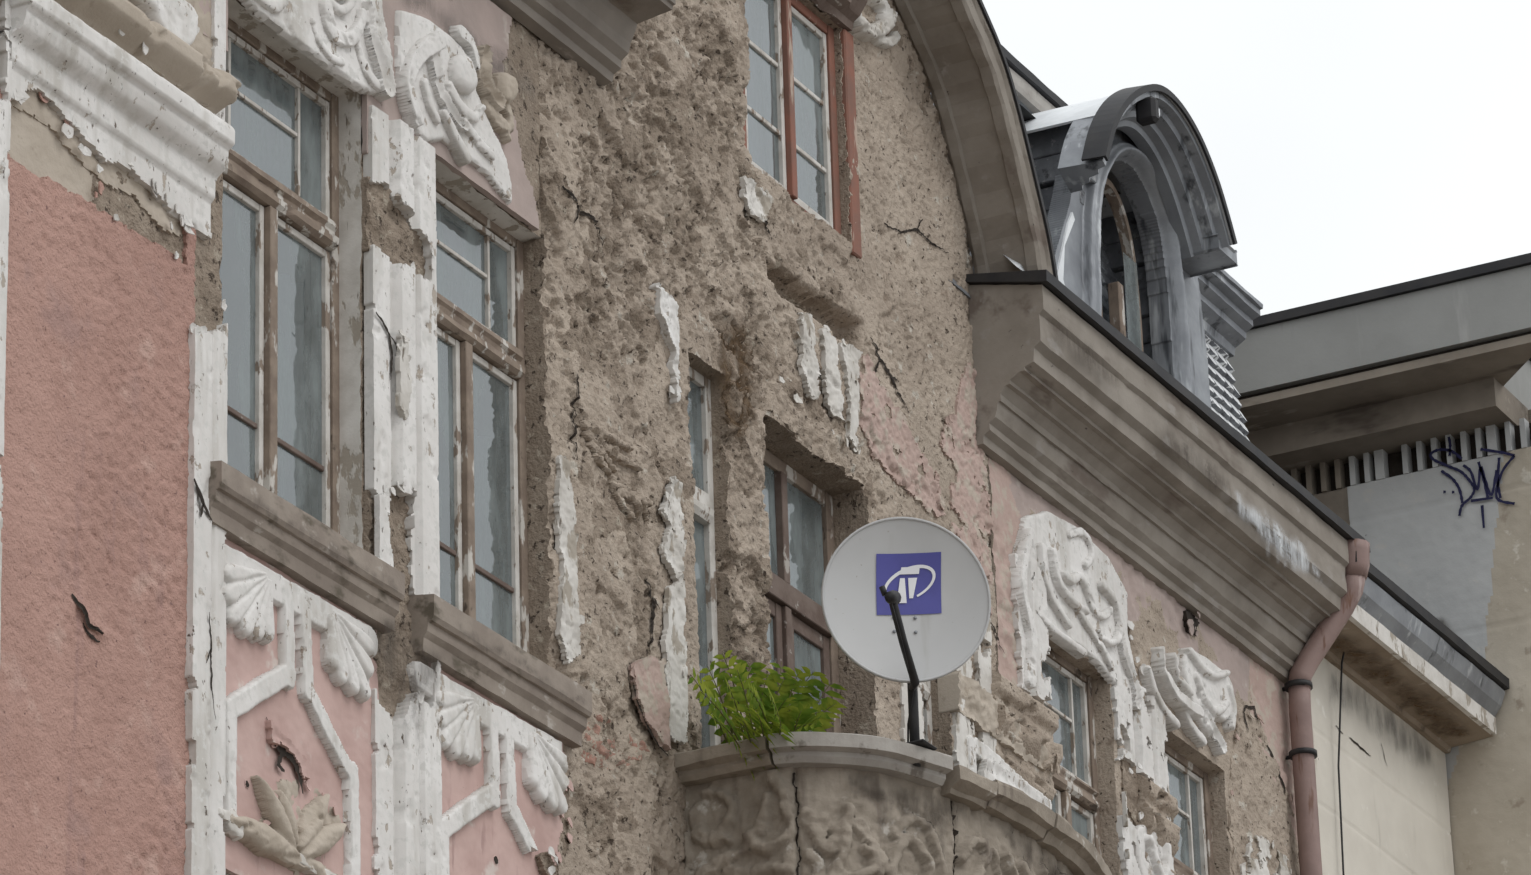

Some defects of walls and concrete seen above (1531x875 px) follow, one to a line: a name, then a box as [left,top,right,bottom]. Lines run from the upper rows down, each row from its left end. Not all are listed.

flaking render [142,42,215,114]
flaking render [185,0,213,60]
flaking render [0,88,227,335]
flaking render [361,176,436,277]
crack [884,219,949,253]
flaking render [356,480,441,717]
peeling [265,719,341,825]
crack [792,772,801,875]